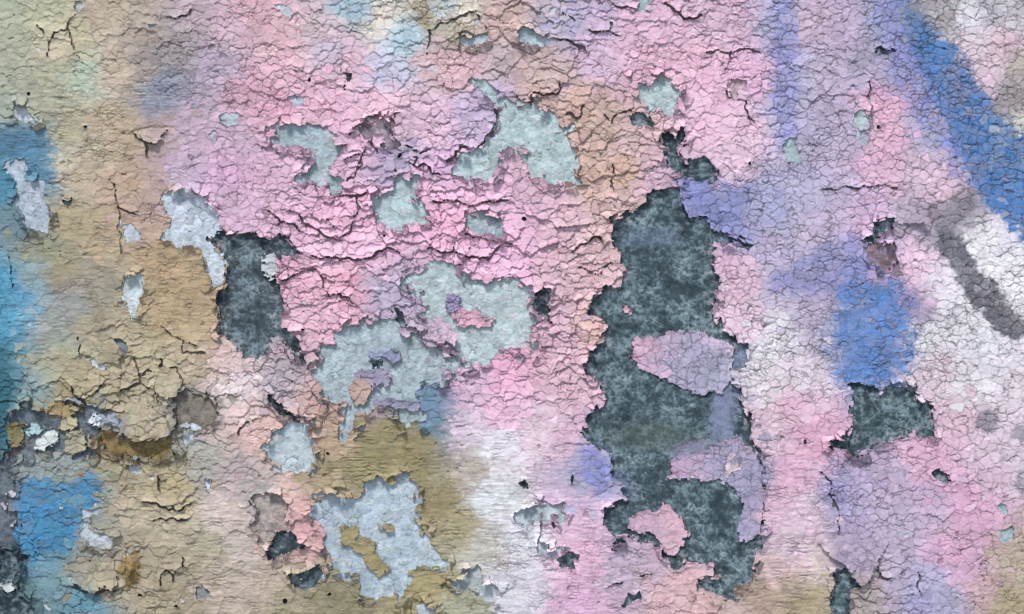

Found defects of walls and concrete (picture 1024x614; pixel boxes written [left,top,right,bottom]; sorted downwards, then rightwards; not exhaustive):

crack [426,11,487,55]
crack [557,3,627,54]
crack [664,2,702,20]
crack [706,48,760,60]
peeling [3,158,72,245]
crack [267,83,637,306]
crack [822,183,897,191]
crack [71,325,206,406]
peeling [113,78,592,614]
peeling [575,67,778,614]
peeling [821,375,944,465]
crack [142,475,192,521]